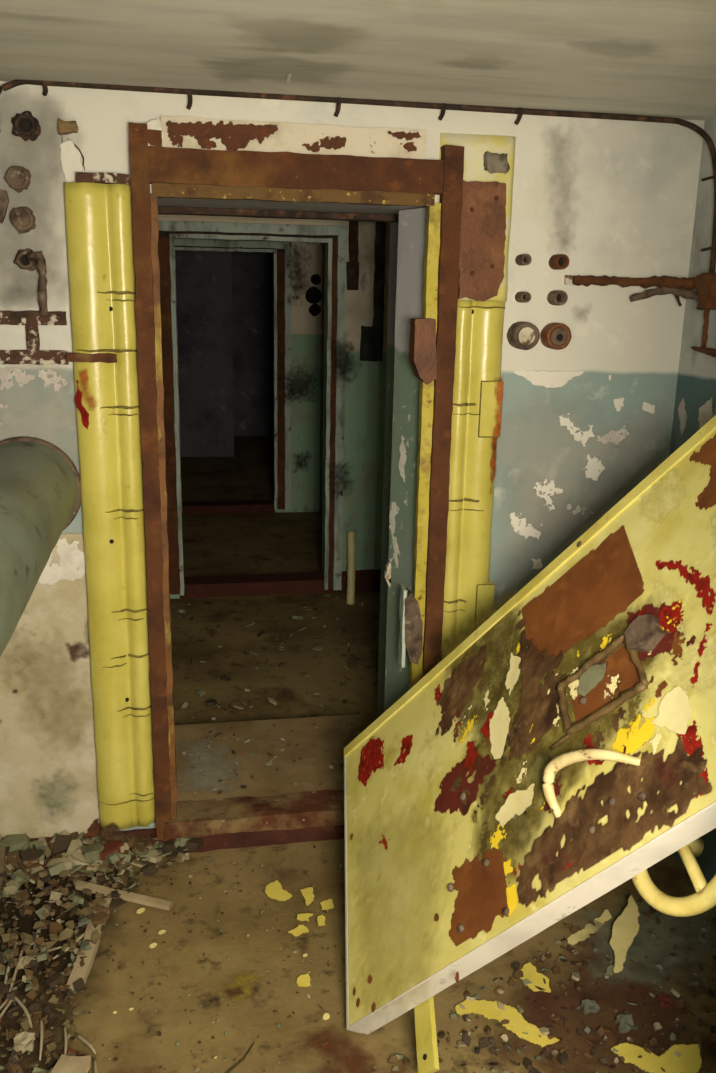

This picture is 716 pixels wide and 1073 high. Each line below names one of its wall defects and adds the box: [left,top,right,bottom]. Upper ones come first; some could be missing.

corrosion [147,119,164,146]
peeling [0,367,68,391]
peeling [513,369,584,388]
peeling [613,397,625,412]
peeling [642,402,655,414]
peeling [559,413,630,481]
peeling [533,479,594,519]
peeling [510,512,542,540]
flaking render [0,533,126,845]